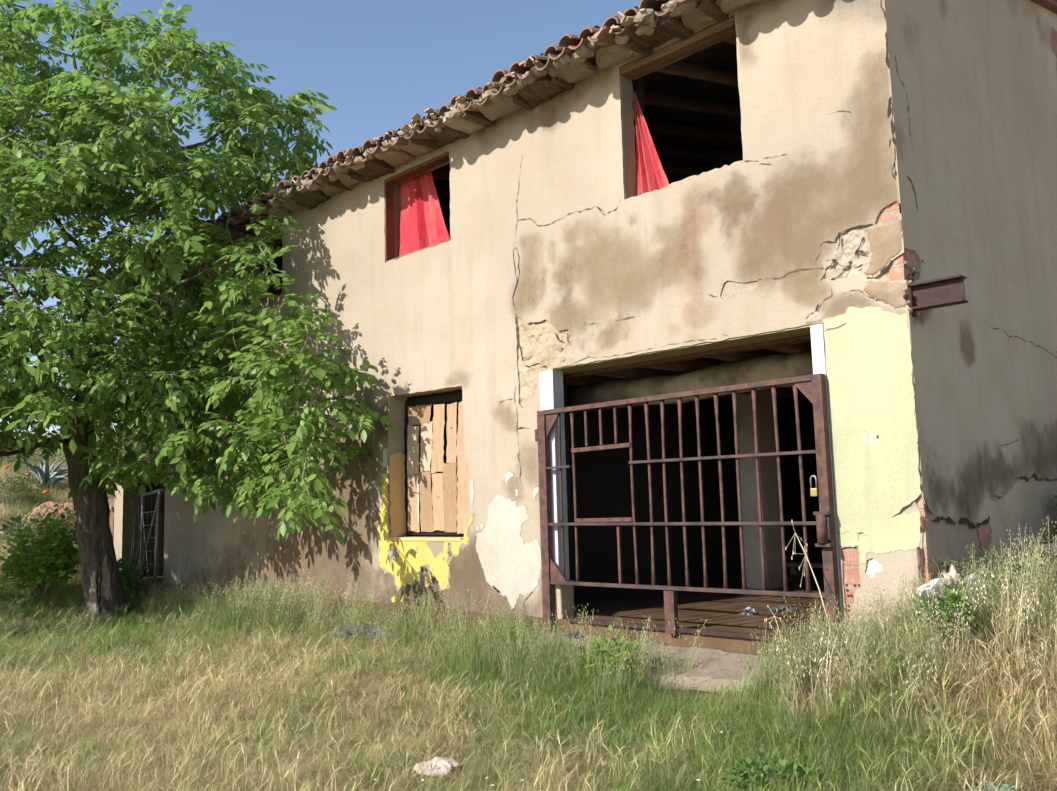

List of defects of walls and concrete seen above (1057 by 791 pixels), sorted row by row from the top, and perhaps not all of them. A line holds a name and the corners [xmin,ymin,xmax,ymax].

crack [880,6,918,208]
flaking render [516,314,574,408]
crack [512,154,620,308]
leakage [745,83,895,298]
crack [758,224,892,331]
flaking render [823,229,870,280]
leakage [832,298,864,314]
peeling [376,447,541,609]
flaking render [842,546,882,624]
leakage [931,454,1010,515]
crack [893,338,1057,577]
flaking render [916,475,1057,591]